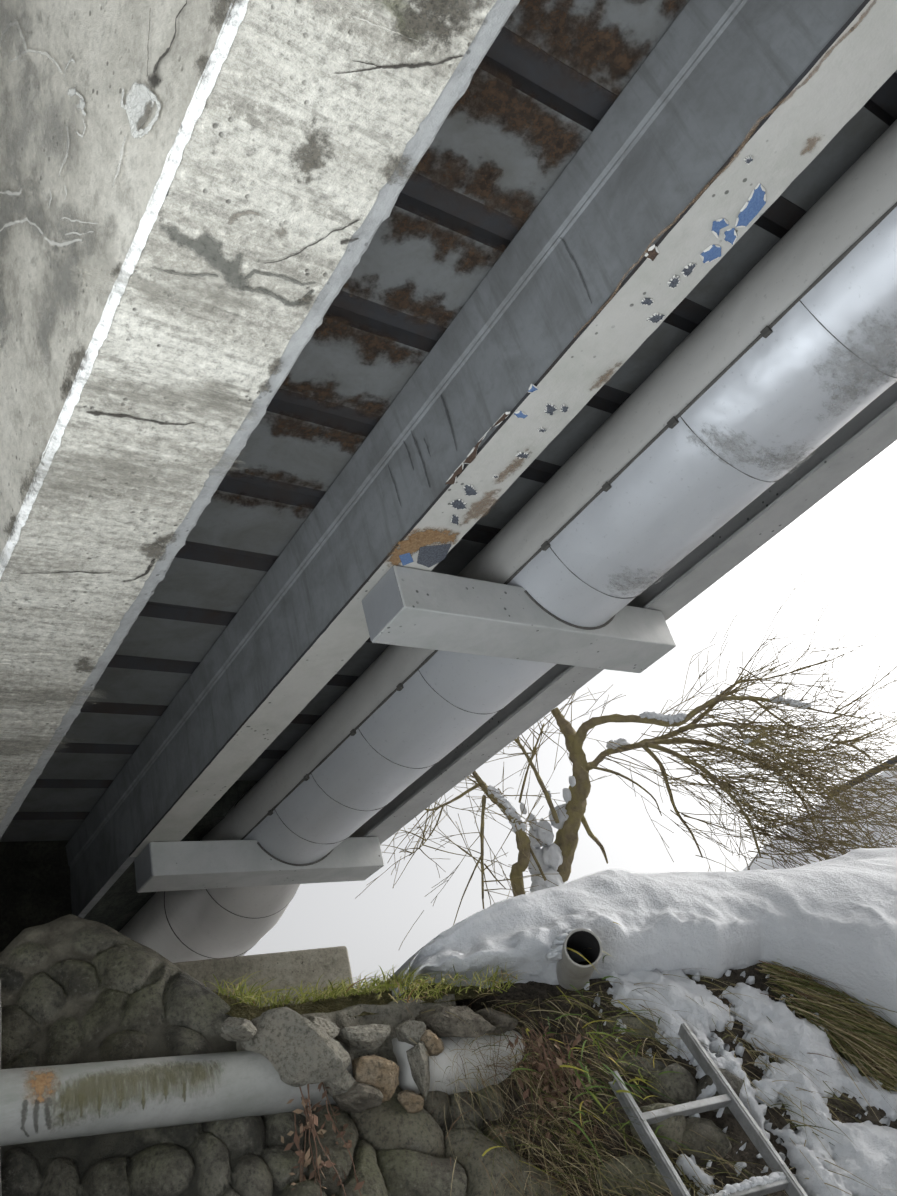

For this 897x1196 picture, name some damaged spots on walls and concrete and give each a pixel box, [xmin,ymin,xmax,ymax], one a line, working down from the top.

spalling [113,0,187,185]
crack [336,55,462,74]
rust [447,63,582,173]
rust [508,0,650,99]
rust [411,149,535,229]
crack [153,220,359,307]
rust [386,207,506,273]
peeling [645,244,659,261]
peeling [667,183,766,289]
peeling [641,298,665,323]
crack [87,411,195,425]
damp [54,1063,217,1125]